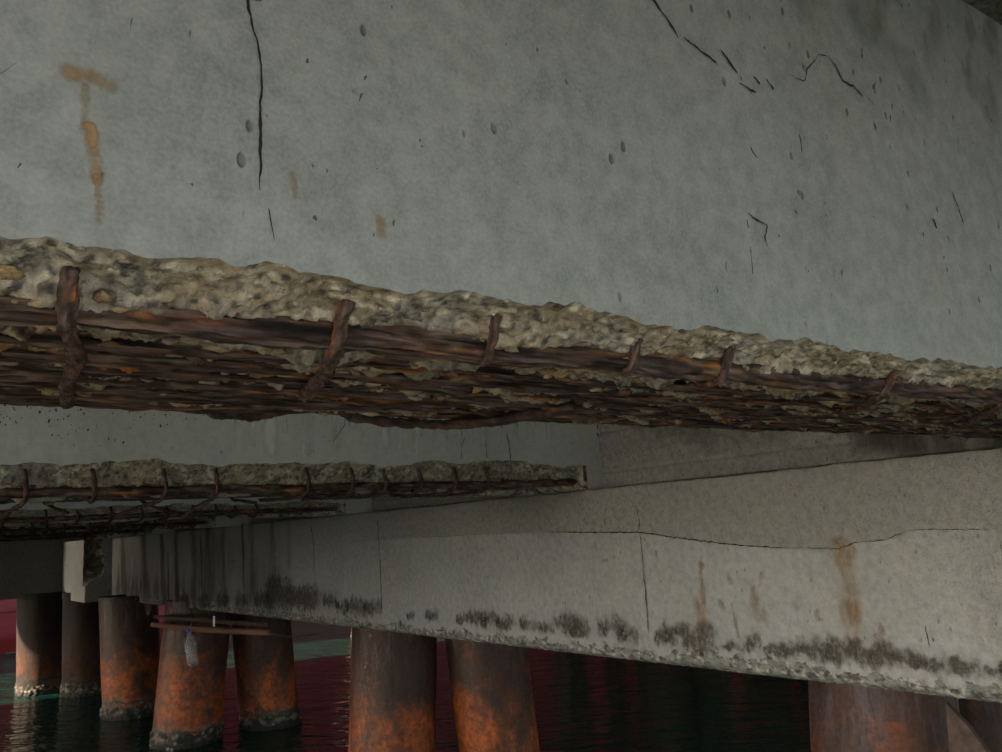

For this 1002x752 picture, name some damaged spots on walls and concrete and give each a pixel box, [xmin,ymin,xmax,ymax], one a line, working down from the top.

crack [653,0,873,103]
spalling [963,0,1002,25]
rust [82,122,101,209]
crack [246,0,275,240]
spalling [0,236,1002,446]
spalling [0,458,588,532]
spalling [82,539,105,587]
crack [545,512,981,631]